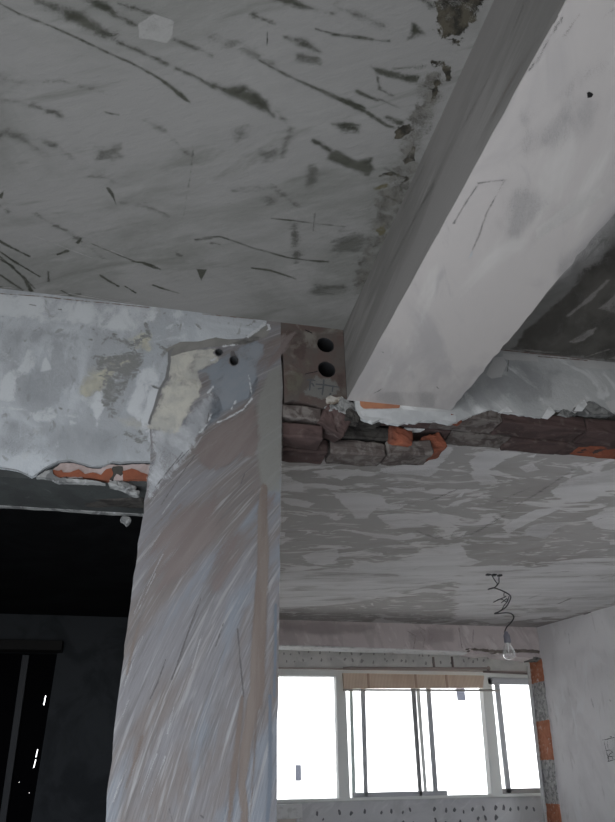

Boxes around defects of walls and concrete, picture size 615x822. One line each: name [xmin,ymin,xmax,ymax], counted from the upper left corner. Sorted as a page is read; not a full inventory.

peeling [486,349,615,378]
spalling [281,395,615,472]
flaking render [1,459,152,498]